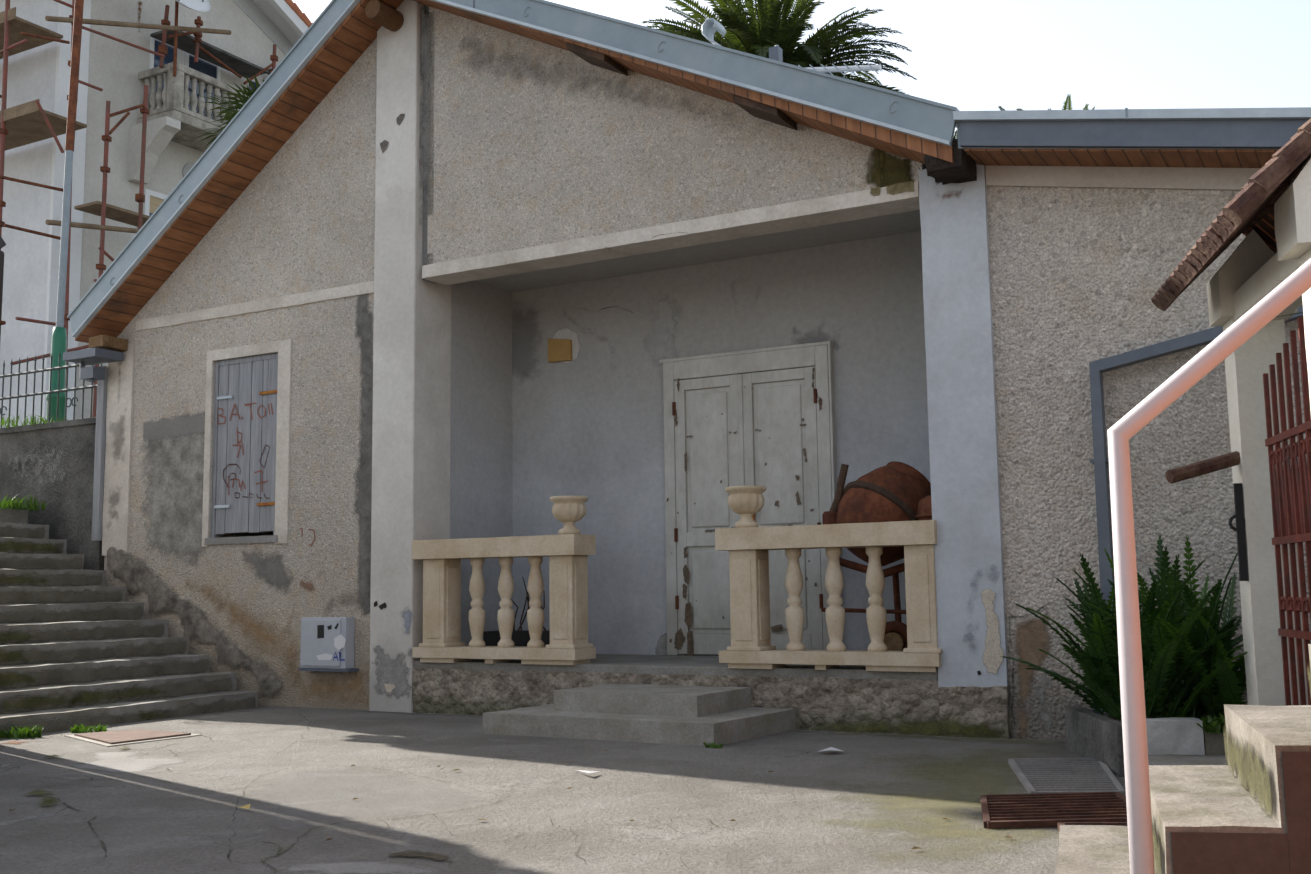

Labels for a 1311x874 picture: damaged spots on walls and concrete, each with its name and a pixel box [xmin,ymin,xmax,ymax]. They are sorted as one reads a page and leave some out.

spalling [142,413,205,564]
spalling [107,547,282,697]
peeling [372,610,412,698]
spalling [966,568,1050,737]
crack [7,755,107,871]
crack [227,714,502,869]